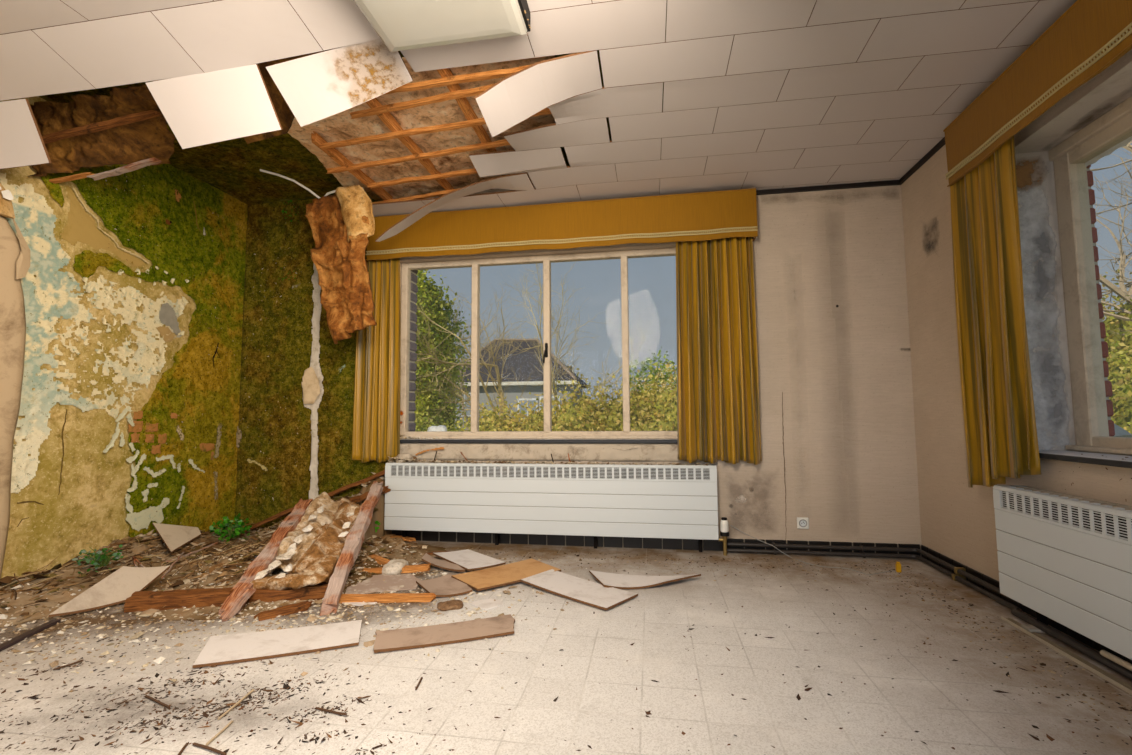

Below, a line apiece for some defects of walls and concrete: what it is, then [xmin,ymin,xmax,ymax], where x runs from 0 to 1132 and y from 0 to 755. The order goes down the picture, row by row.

damp [336,45,403,105]
peeling [0,173,214,531]
peeling [1017,183,1069,449]